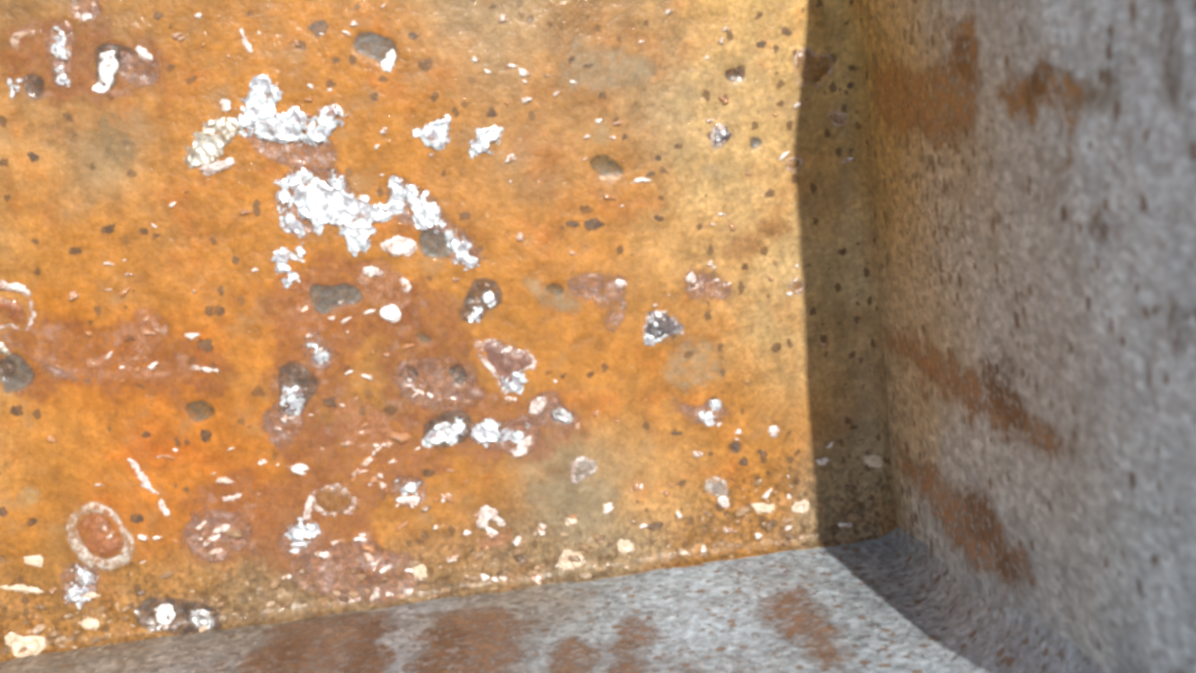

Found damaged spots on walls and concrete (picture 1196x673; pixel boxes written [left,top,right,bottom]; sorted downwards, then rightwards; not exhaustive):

peeling [92,44,159,93]
rust [998,60,1088,131]
peeling [183,74,504,447]
peeling [396,358,579,457]
rust [886,333,1062,457]
rust [900,451,1035,585]
peeling [134,597,221,635]
rust [415,608,531,673]
rust [550,639,592,673]
rust [761,591,842,669]